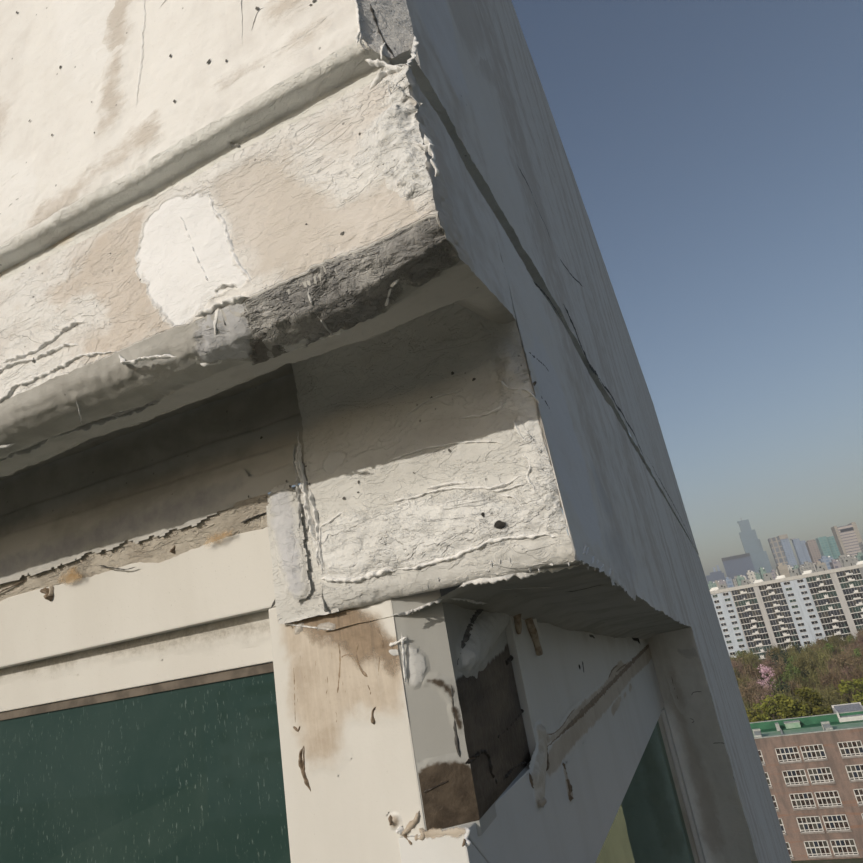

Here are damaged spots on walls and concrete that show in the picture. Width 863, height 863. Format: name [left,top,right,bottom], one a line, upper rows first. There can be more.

peeling [194,137,462,365]
crack [534,282,685,526]
leakage [0,602,409,779]
peeling [389,635,407,684]
peeling [462,827,471,848]